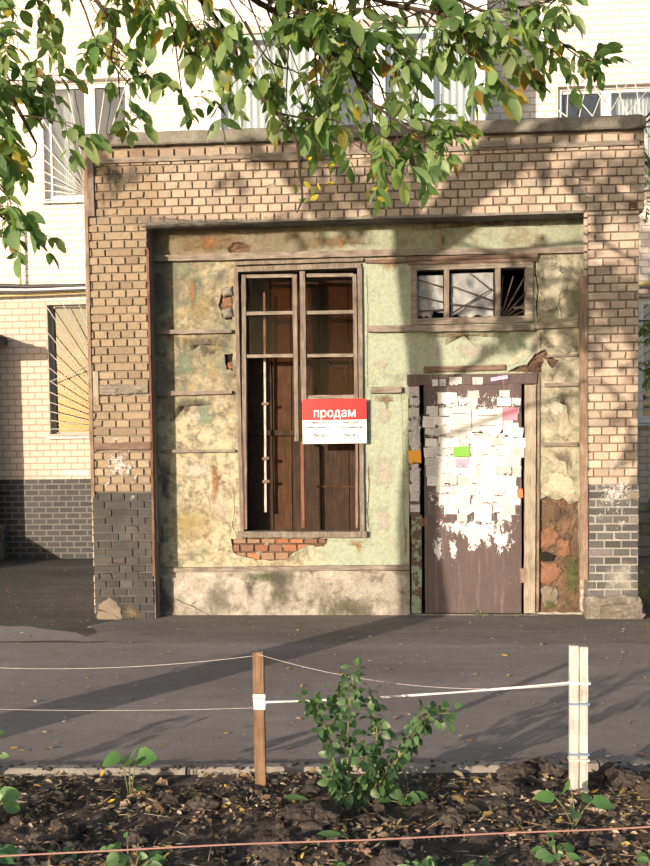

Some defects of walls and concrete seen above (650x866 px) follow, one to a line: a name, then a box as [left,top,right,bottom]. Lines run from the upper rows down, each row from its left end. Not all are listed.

spalling [218,286,234,321]
peeling [542,260,565,315]
spalling [224,353,233,371]
peeling [503,331,576,381]
spalling [228,538,328,566]
spalling [537,471,581,613]
damp [271,571,290,604]